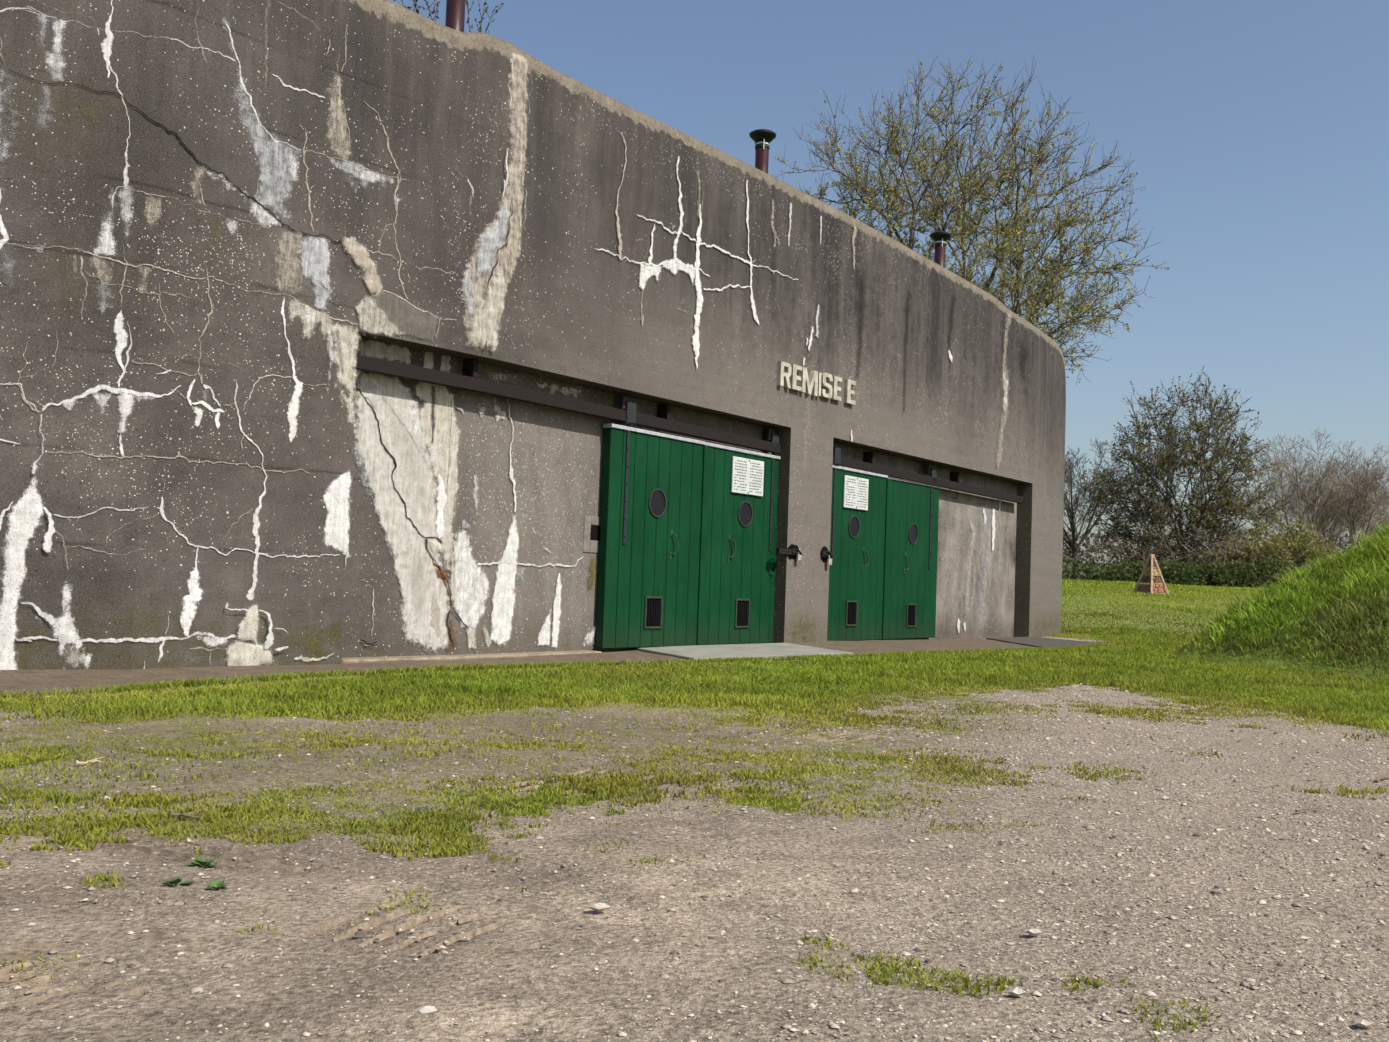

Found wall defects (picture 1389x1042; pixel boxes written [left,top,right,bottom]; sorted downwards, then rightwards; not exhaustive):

crack [0,0,455,600]
leakage [223,20,583,651]
crack [615,133,798,324]
crack [16,616,243,669]